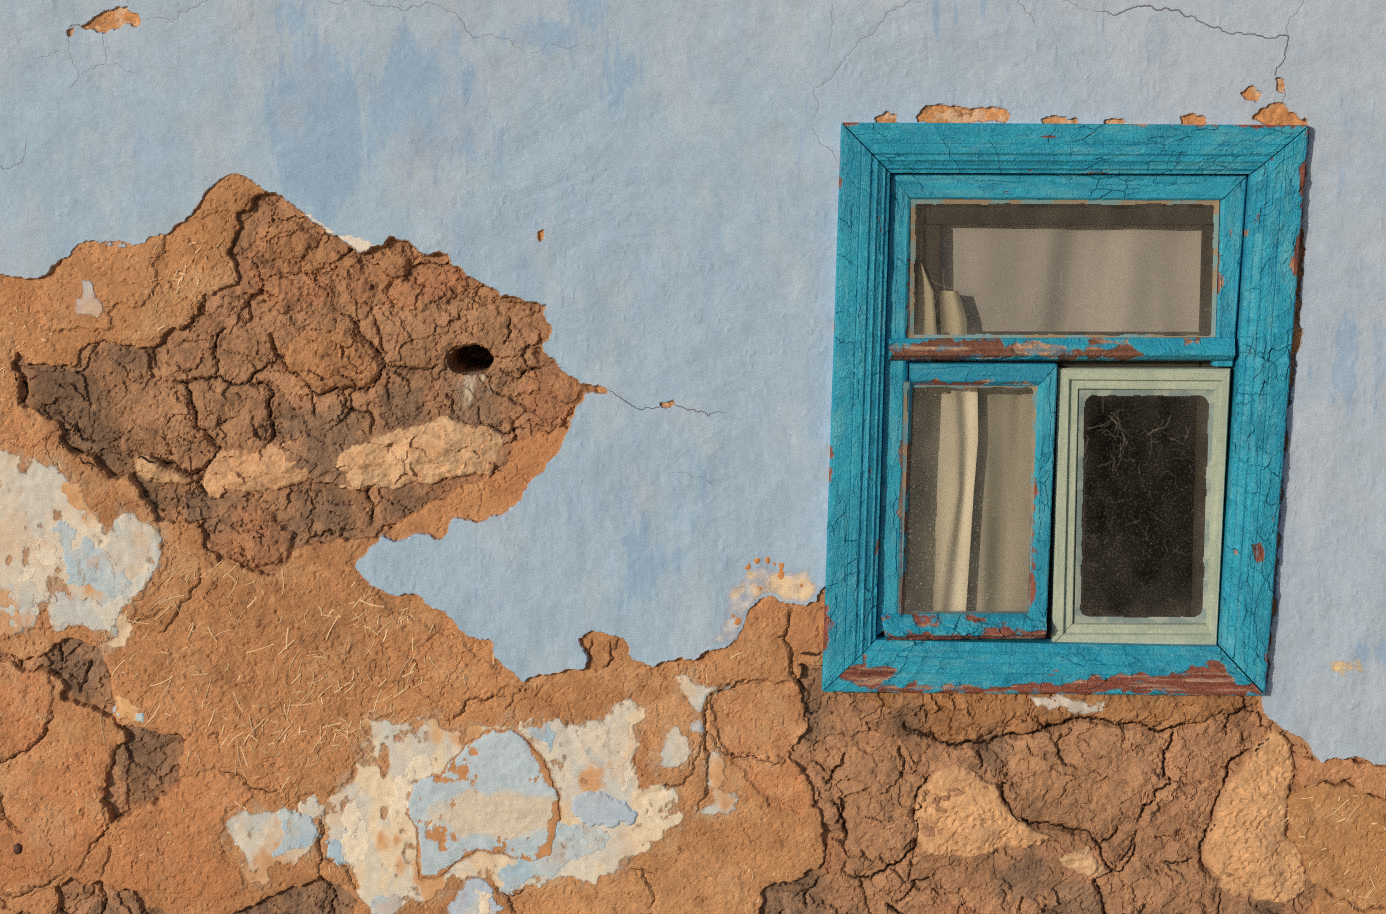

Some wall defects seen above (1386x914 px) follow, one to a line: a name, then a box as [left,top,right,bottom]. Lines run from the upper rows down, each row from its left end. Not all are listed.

spalling [68,7,141,36]
crack [1018,0,1303,100]
spalling [1288,233,1304,403]
spalling [0,174,826,914]
crack [0,709,54,833]
crack [455,686,524,718]
crack [589,639,619,668]
crack [665,679,786,812]
crack [777,610,822,723]
spalling [760,663,1386,914]
crack [86,828,112,877]
crack [318,820,356,889]